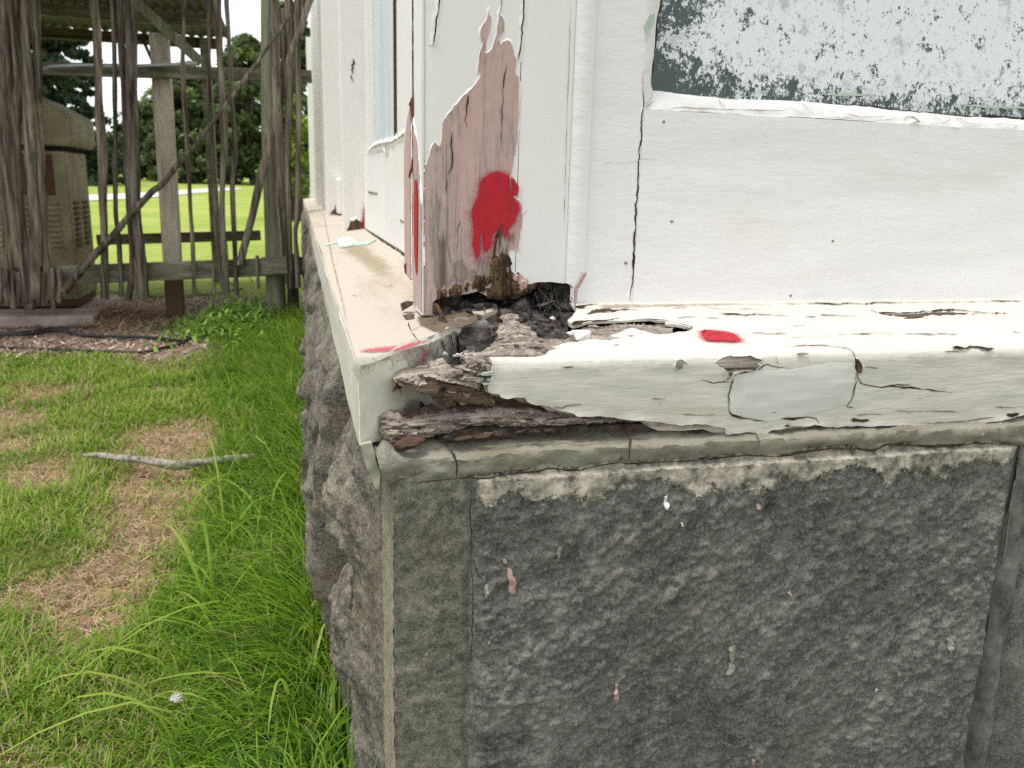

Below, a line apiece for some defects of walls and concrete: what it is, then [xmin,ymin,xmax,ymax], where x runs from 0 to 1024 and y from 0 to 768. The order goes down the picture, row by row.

peeling [368,0,528,315]
peeling [574,272,642,328]
peeling [866,311,977,321]
peeling [352,327,461,381]
peeling [672,358,688,371]
crack [412,0,1024,709]
peeling [715,352,764,383]
peeling [853,357,864,376]